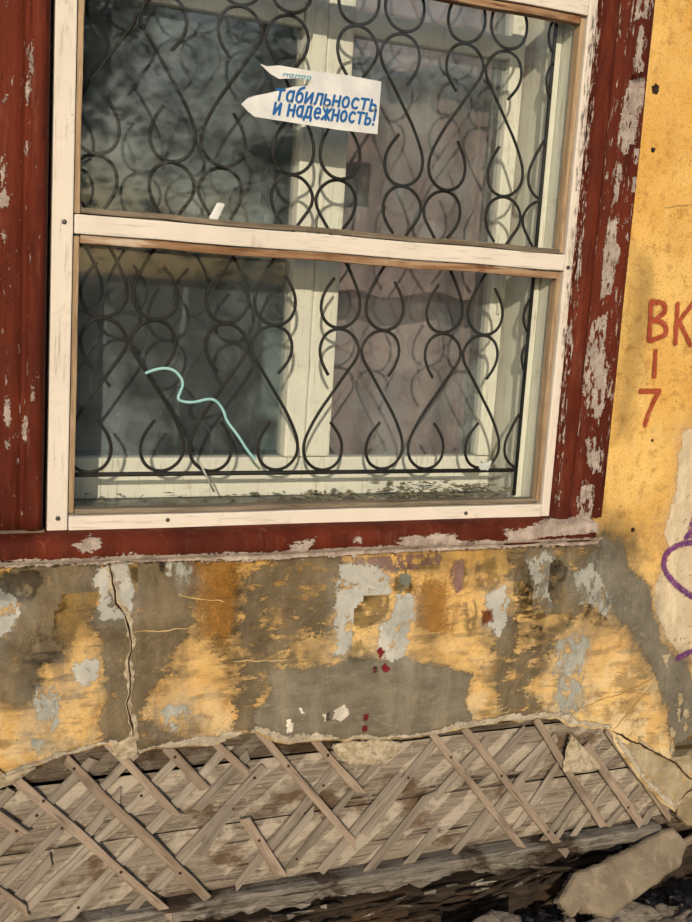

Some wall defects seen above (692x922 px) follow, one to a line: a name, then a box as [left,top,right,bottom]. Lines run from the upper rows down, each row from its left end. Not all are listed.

peeling [1,40,39,106]
peeling [0,154,13,208]
peeling [555,0,603,506]
peeling [577,0,654,474]
peeling [3,361,39,450]
crack [106,563,194,741]
crack [572,676,692,801]